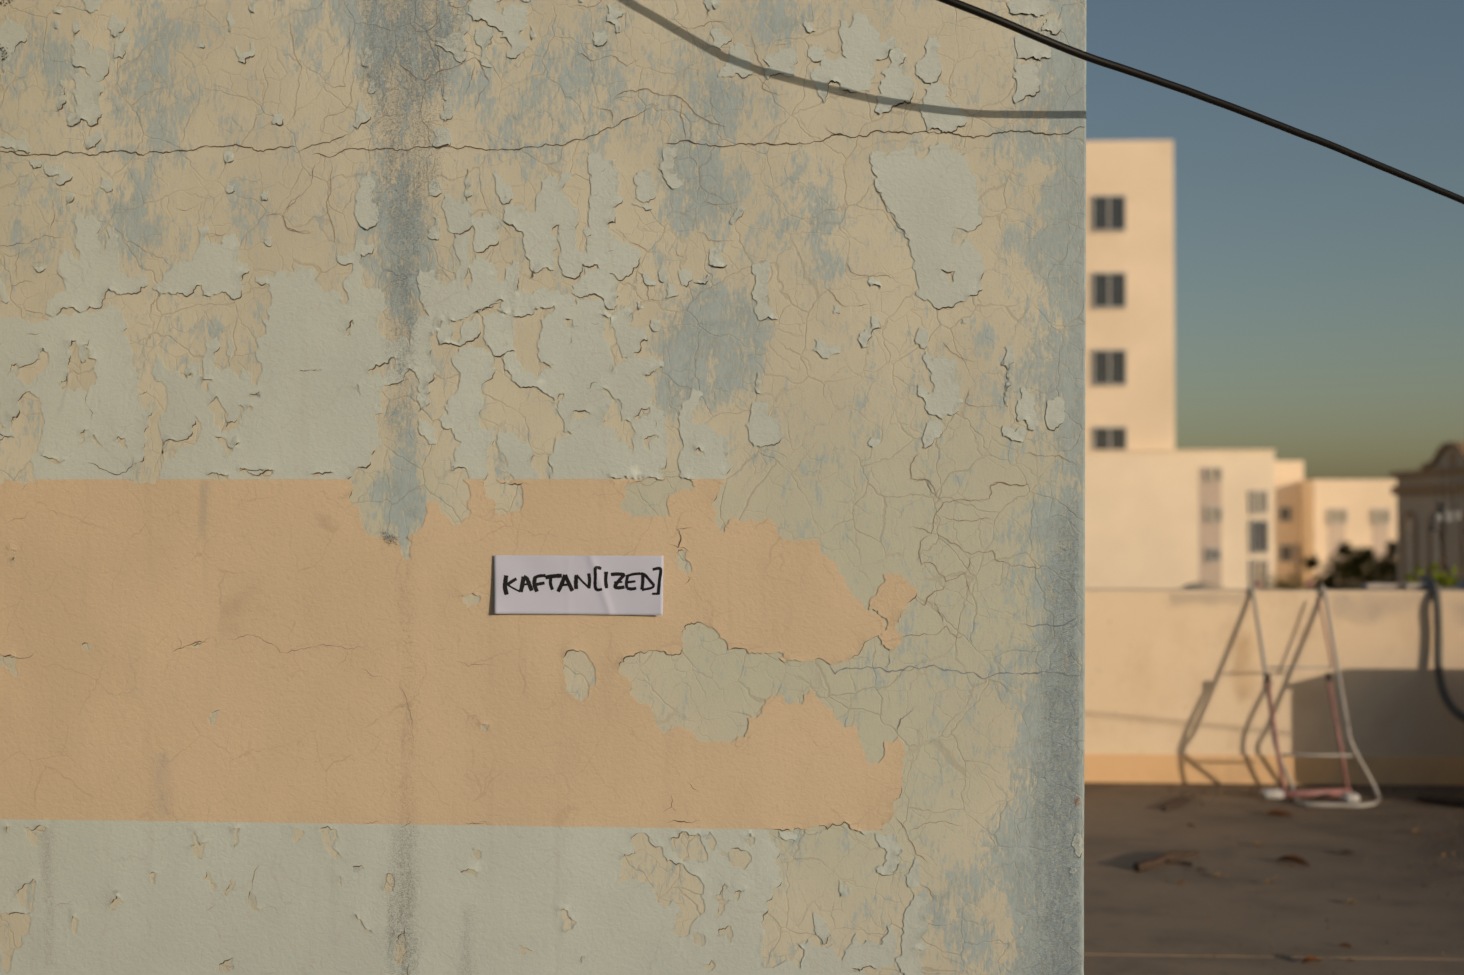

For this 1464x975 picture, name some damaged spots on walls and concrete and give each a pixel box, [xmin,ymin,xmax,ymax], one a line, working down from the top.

peeling [0,135,266,317]
crack [1,0,1082,244]
peeling [428,146,727,452]
crack [608,200,731,301]
peeling [704,0,984,323]
crack [823,264,891,307]
peeling [1007,0,1062,103]
peeling [161,373,274,482]
peeling [348,374,524,559]
crack [830,452,1083,679]
peeling [619,831,755,972]
crack [897,819,957,926]